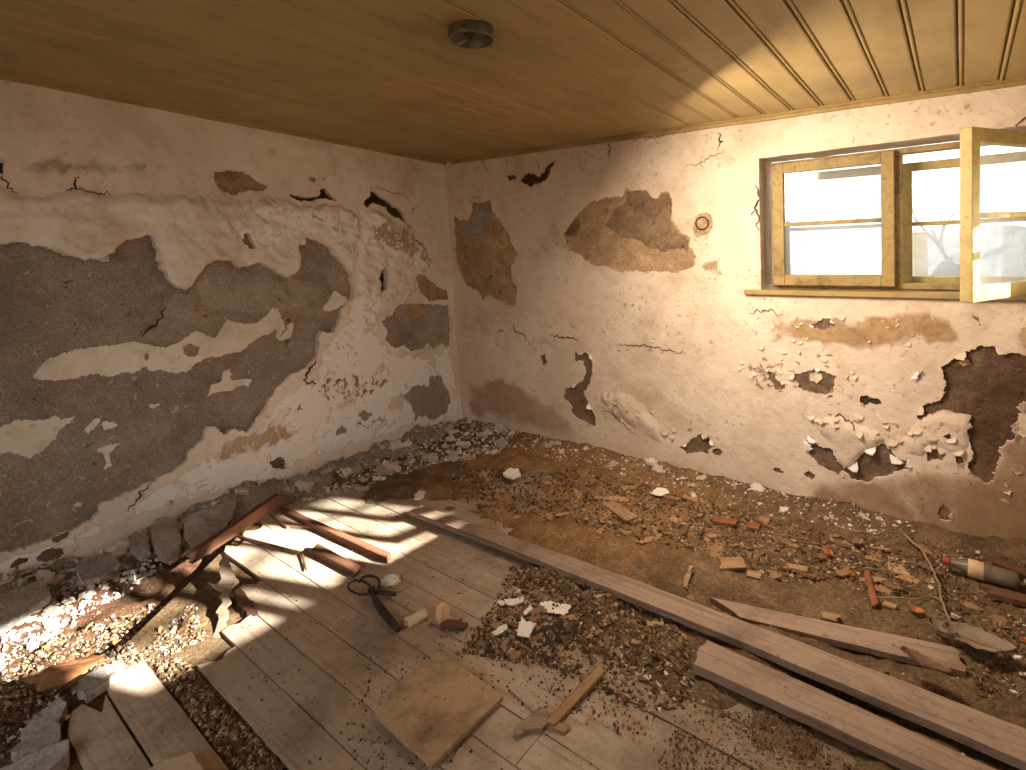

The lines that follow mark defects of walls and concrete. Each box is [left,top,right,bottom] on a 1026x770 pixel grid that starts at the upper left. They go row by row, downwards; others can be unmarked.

crack [364,185,431,260]
peeling [454,200,518,306]
peeling [564,189,713,274]
spalling [382,274,451,351]
spalling [0,216,360,570]
spalling [564,352,596,427]
spalling [803,345,1026,505]